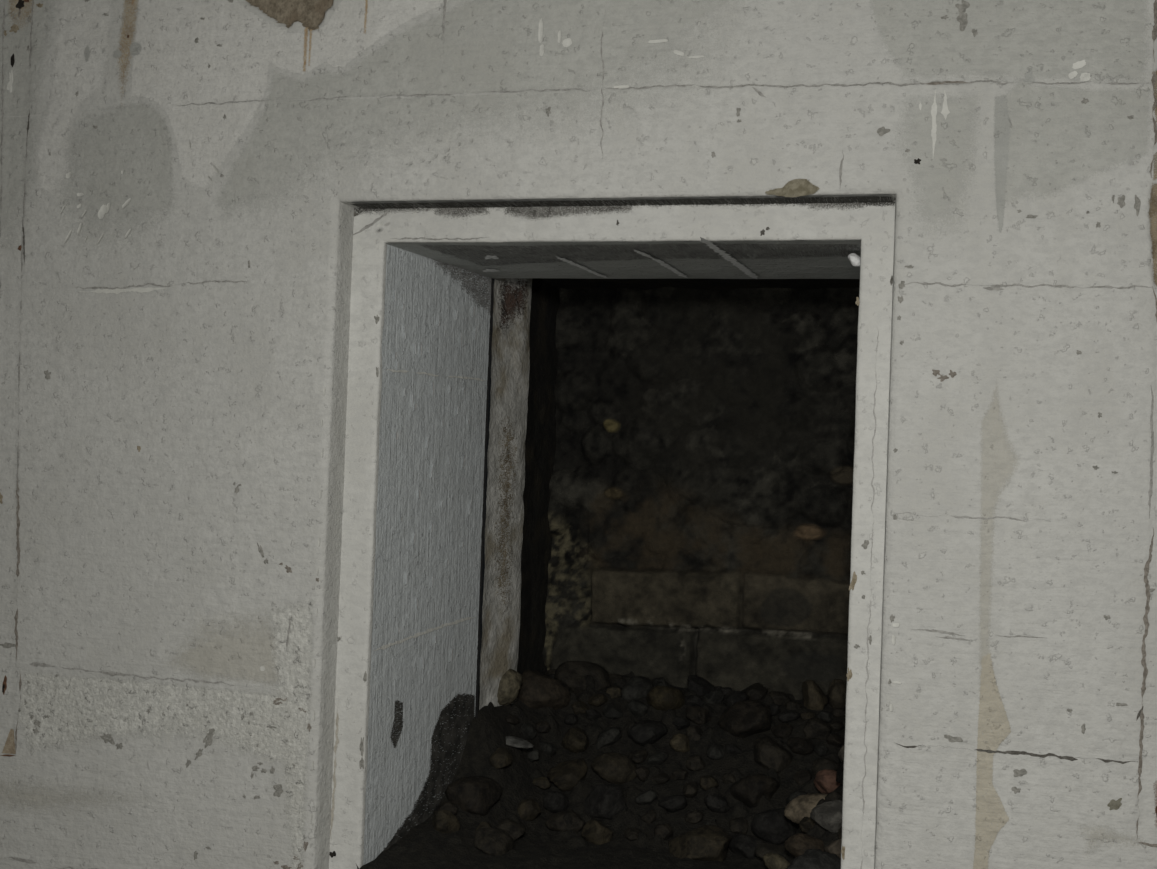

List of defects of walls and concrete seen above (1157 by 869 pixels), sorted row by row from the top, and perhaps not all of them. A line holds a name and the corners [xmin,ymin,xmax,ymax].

rust [84,0,142,104]
spalling [228,0,334,71]
spalling [1112,183,1157,286]
crack [903,282,1157,320]
crack [0,0,348,840]
water stain [973,377,1020,869]
crack [964,388,1157,847]